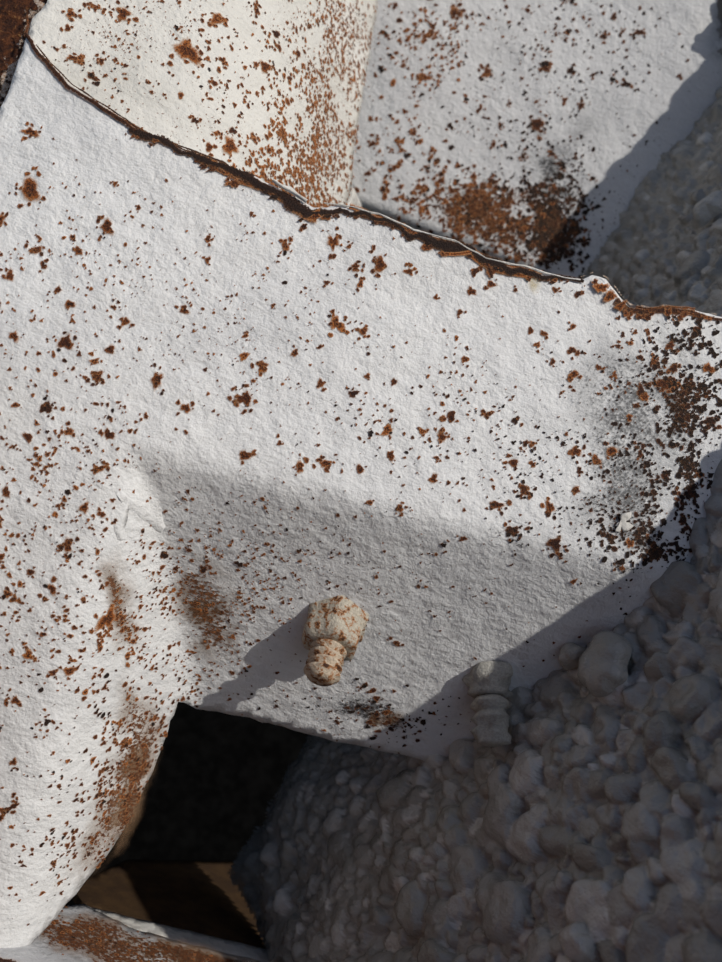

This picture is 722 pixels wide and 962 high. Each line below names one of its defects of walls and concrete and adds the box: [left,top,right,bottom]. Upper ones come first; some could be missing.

corrosion [21,121,42,141]
crack [24,14,148,133]
corrosion [43,0,669,298]
corrosion [42,906,238,962]